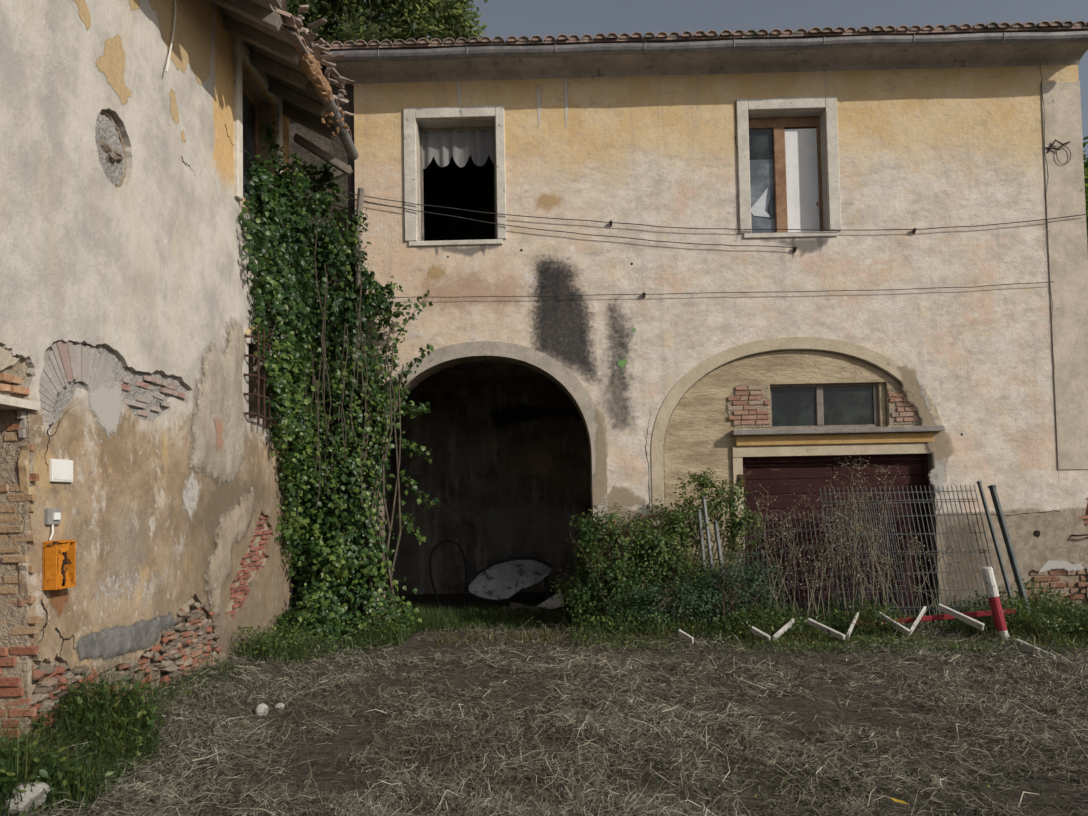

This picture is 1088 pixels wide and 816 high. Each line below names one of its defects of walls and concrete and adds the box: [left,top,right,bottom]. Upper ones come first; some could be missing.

peeling [96,34,132,105]
peeling [129,0,213,85]
leakage [531,257,601,381]
flaking render [0,340,187,749]
flaking render [226,514,272,619]
flaking render [1017,553,1088,610]